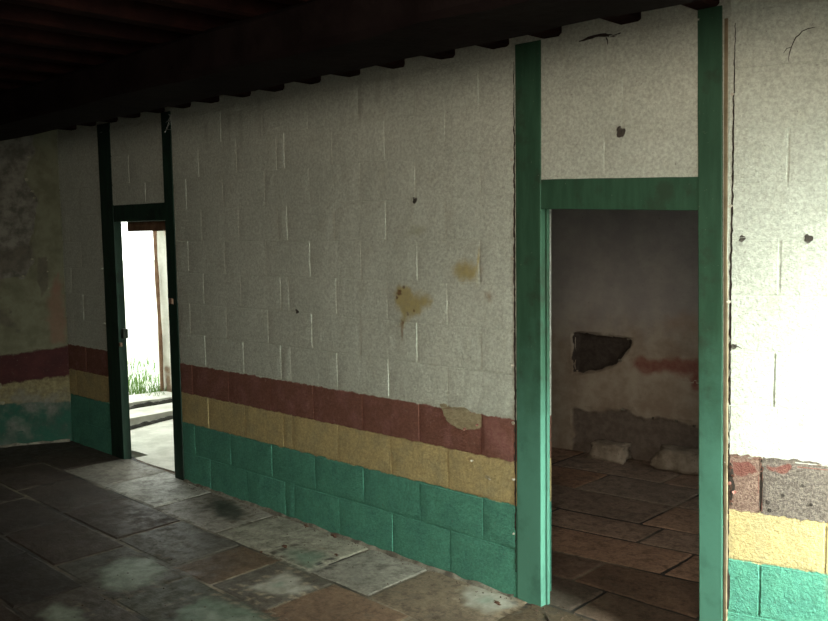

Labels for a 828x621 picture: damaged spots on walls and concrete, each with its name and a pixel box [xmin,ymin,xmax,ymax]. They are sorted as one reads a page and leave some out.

crack [784,27,814,61]
rust [447,245,488,293]
rust [391,277,437,344]
peeling [438,401,517,463]
flaking render [570,403,699,461]
peeling [728,451,828,526]